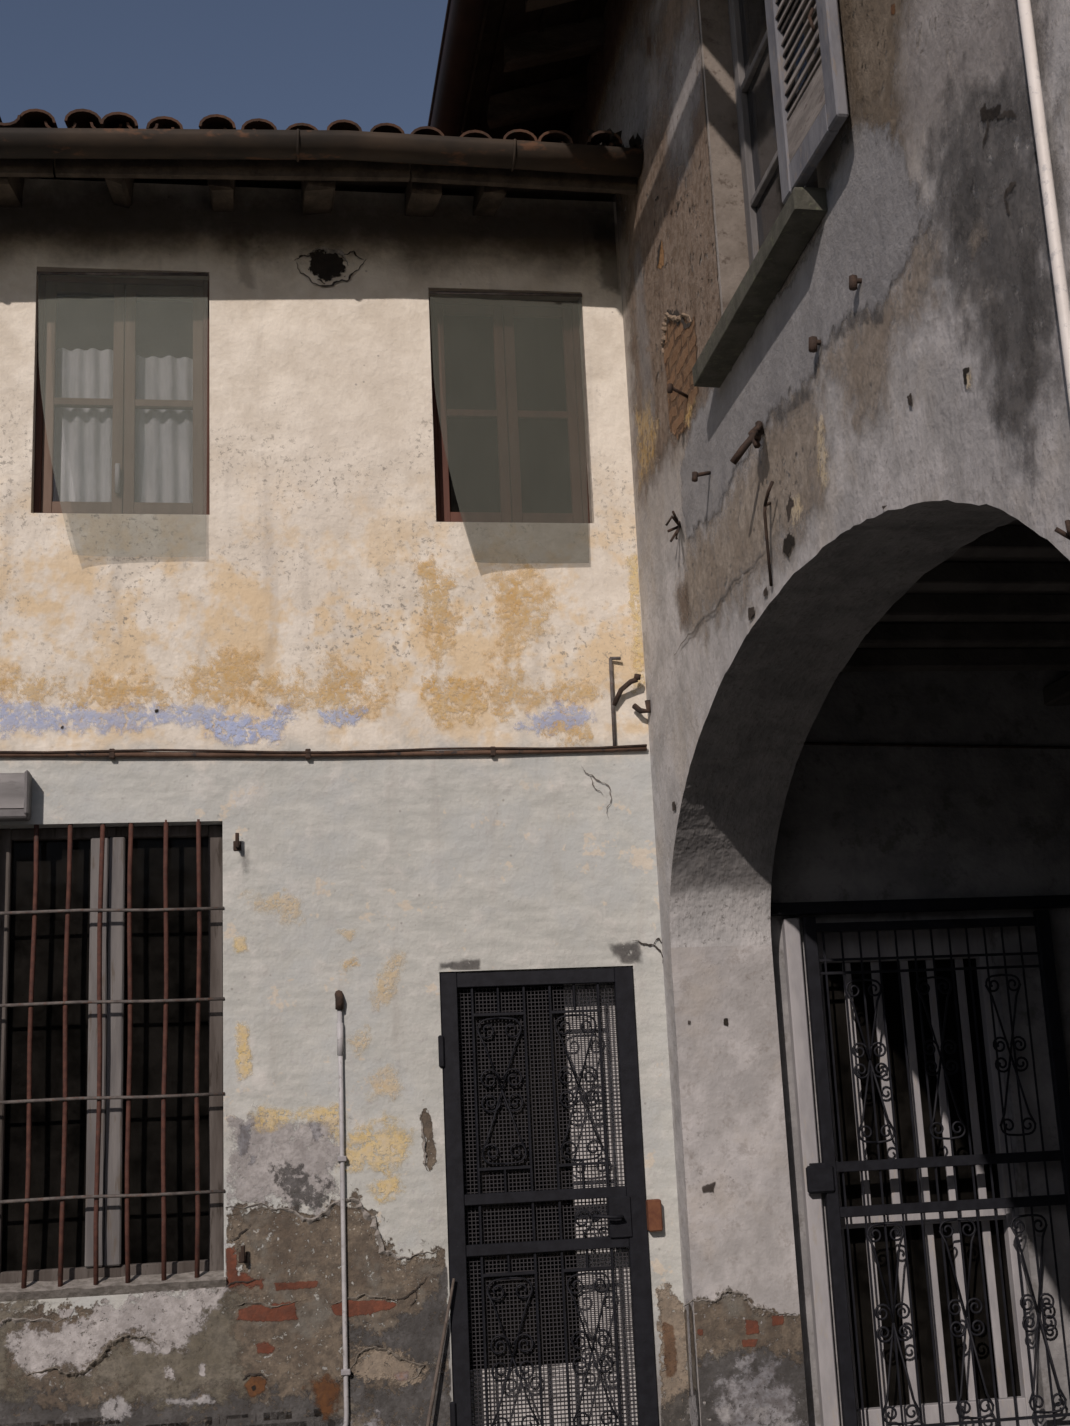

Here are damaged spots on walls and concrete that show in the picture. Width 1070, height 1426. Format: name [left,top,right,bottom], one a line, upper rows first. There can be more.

hole [294,246,366,287]
peeling [570,0,721,492]
peeling [817,228,939,430]
leakage [926,75,1060,468]
peeling [675,384,827,637]
peeling [0,649,397,745]
peeling [418,560,599,744]
peeling [627,555,645,692]
spalling [0,1104,451,1426]
spalling [655,1283,809,1426]